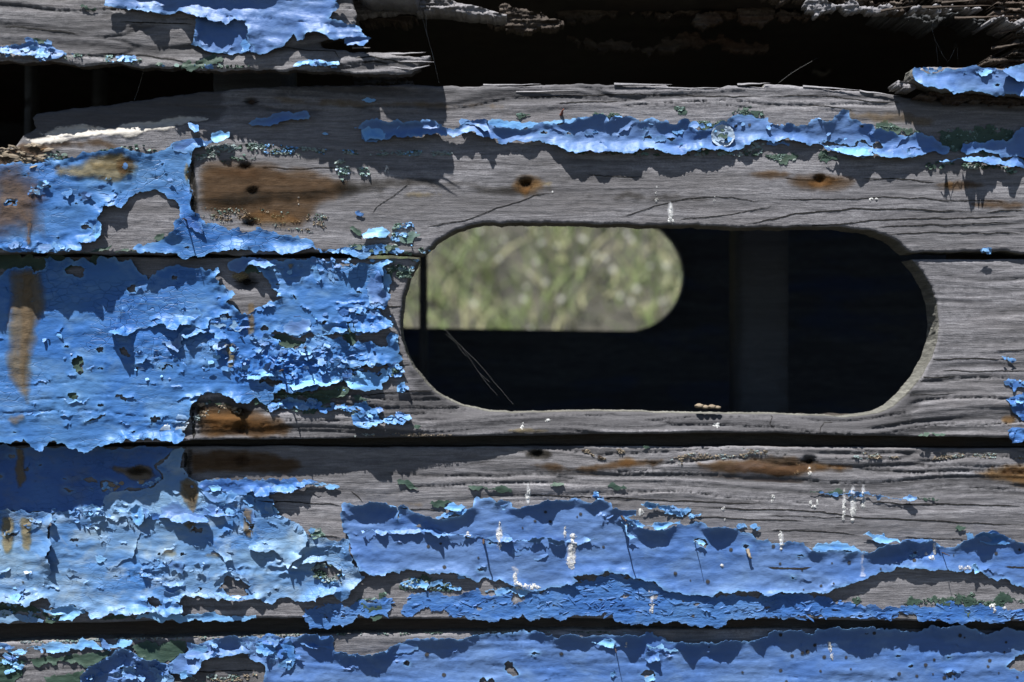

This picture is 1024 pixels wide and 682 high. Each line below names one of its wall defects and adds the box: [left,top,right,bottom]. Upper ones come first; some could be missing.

peeling [104,0,371,69]
peeling [912,64,1024,97]
peeling [355,106,1024,174]
rust [185,161,196,209]
peeling [0,130,420,259]
peeling [0,254,1024,682]